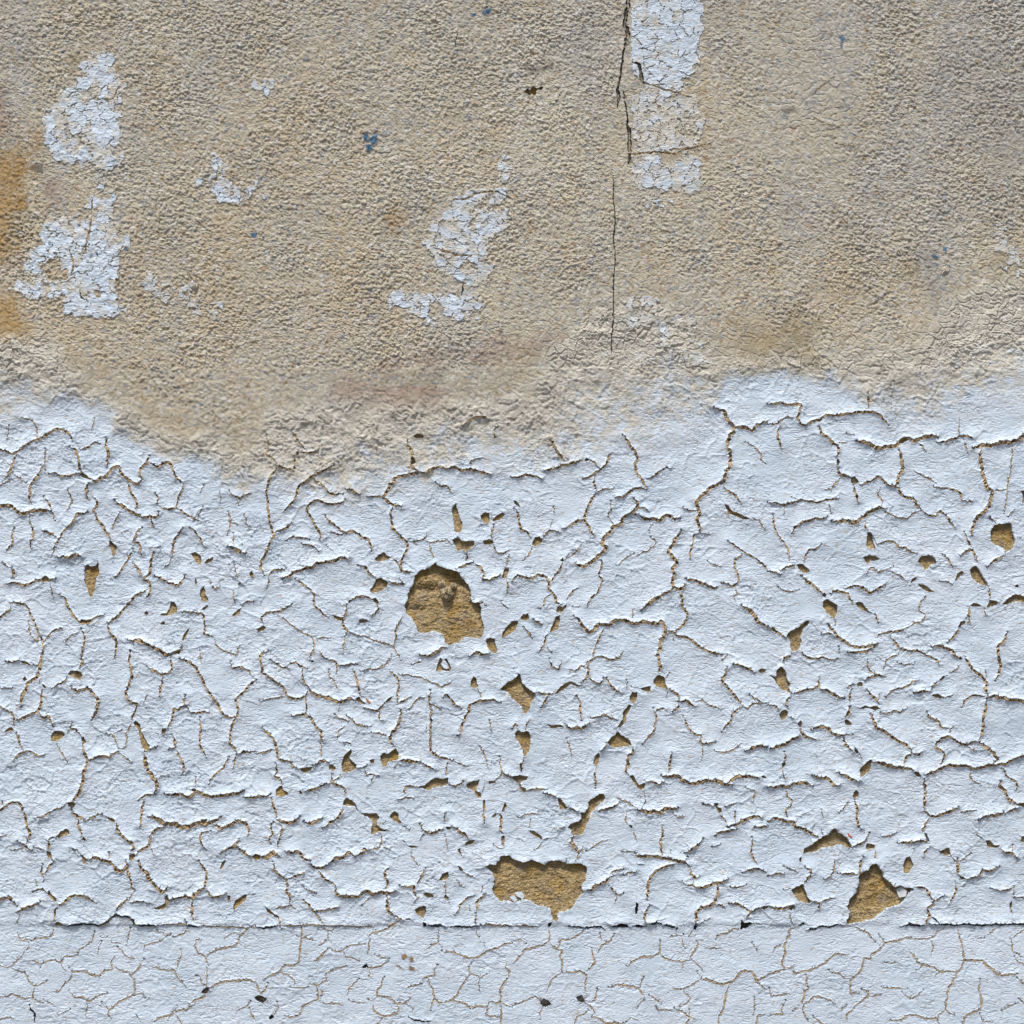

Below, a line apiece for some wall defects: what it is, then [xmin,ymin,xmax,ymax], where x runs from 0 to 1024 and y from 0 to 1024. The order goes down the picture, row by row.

flaking render [0,0,1024,369]
crack [609,0,713,356]
crack [0,392,1024,1024]